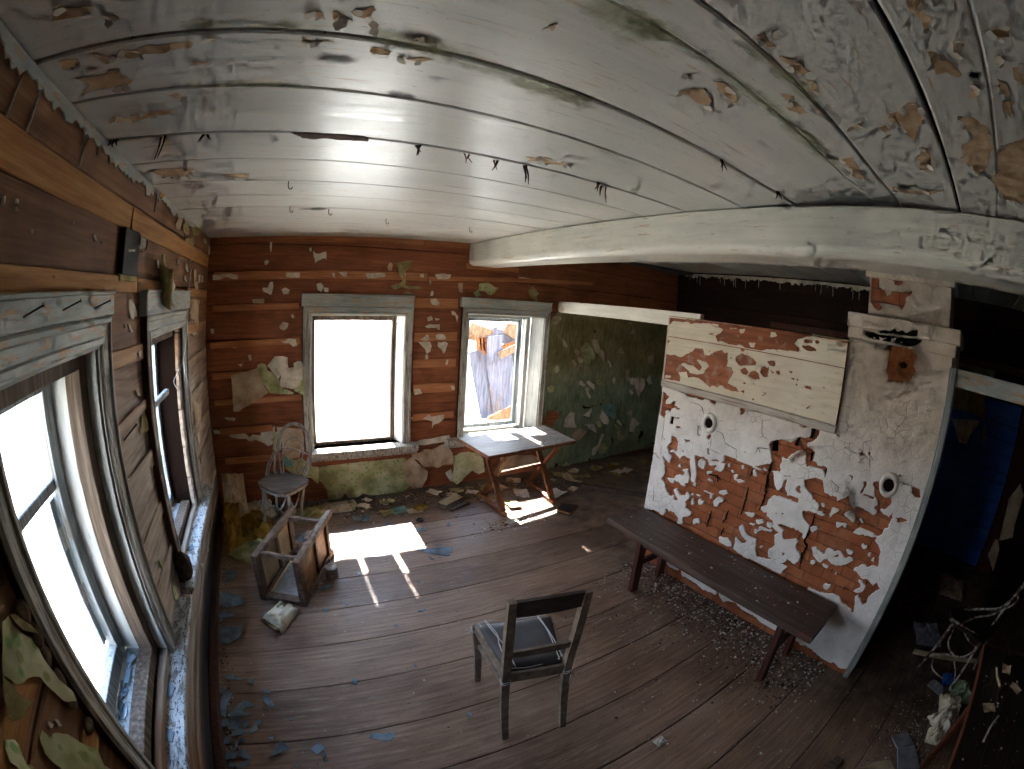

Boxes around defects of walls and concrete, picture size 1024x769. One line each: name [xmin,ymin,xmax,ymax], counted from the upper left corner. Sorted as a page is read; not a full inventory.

peeling [59,37,220,100]
peeling [675,73,739,111]
peeling [926,42,981,98]
peeling [985,28,1024,120]
peeling [880,102,934,174]
peeling [957,116,1024,207]
spalling [870,278,912,311]
peeling [562,318,848,414]
peeling [538,380,640,455]
spalling [647,392,907,612]
crack [799,513,815,569]
spalling [645,549,846,674]